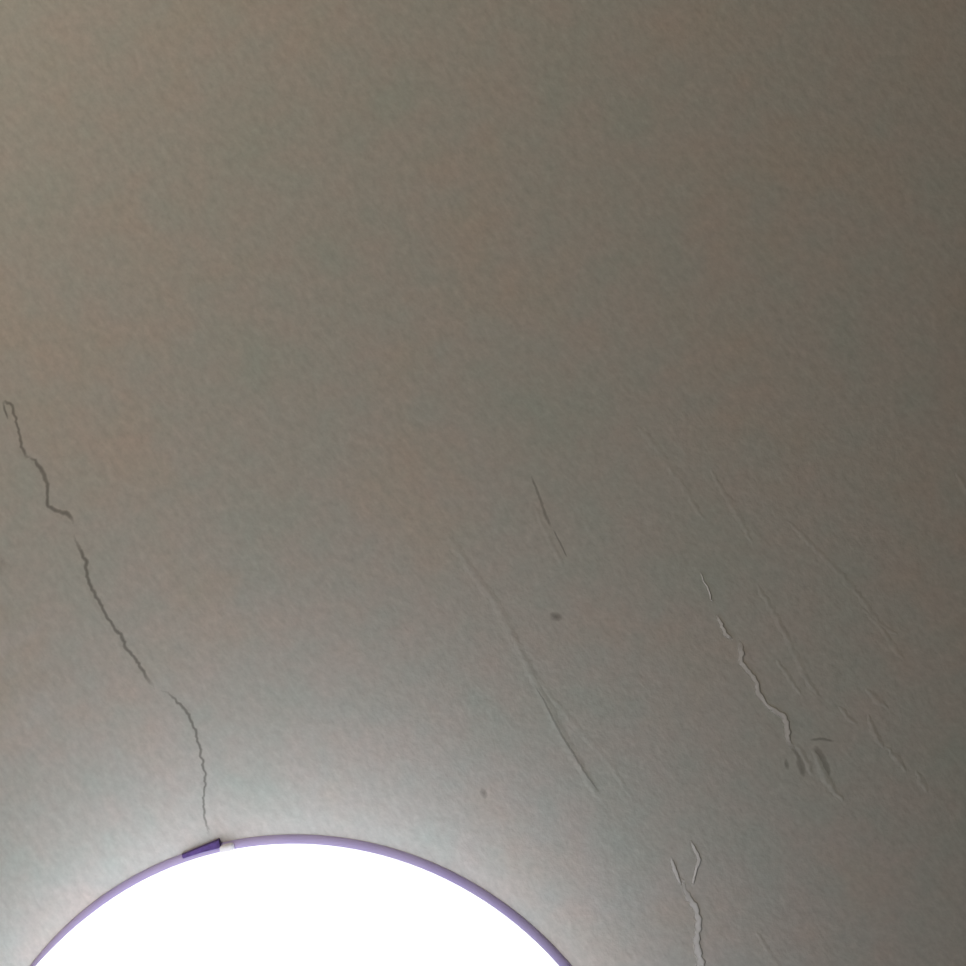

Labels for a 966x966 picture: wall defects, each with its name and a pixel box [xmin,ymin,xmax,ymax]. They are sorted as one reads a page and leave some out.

crack [700,573,844,802]
crack [671,843,705,966]